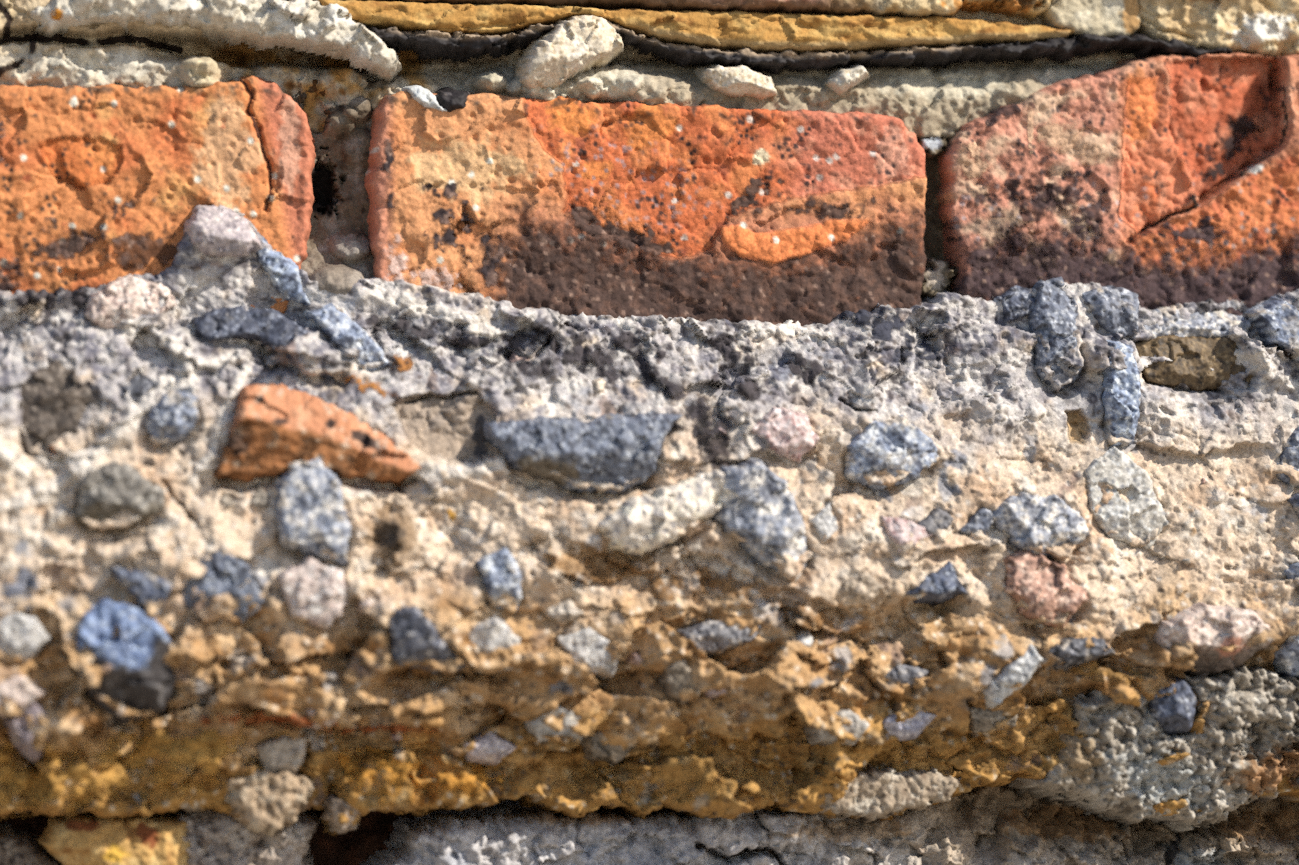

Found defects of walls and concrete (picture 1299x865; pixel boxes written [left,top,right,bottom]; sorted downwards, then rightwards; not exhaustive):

crack [1238,87,1288,176]
crack [1148,195,1199,226]
spalling [392,391,495,462]
spalling [1066,411,1088,443]
crack [1164,834,1181,865]